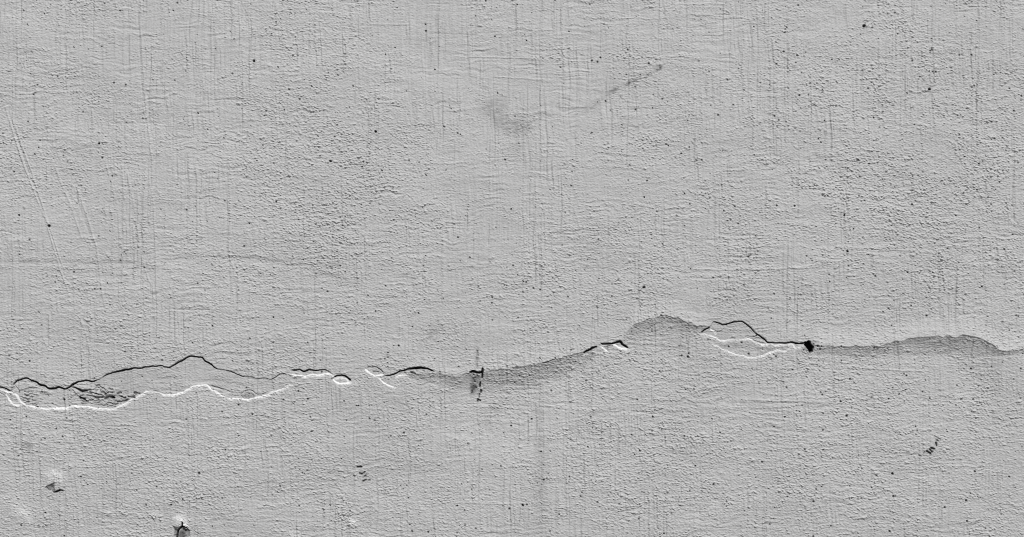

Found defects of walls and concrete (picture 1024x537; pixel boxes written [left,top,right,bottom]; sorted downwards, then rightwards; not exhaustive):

crack [582,340,689,356]
crack [383,366,469,379]